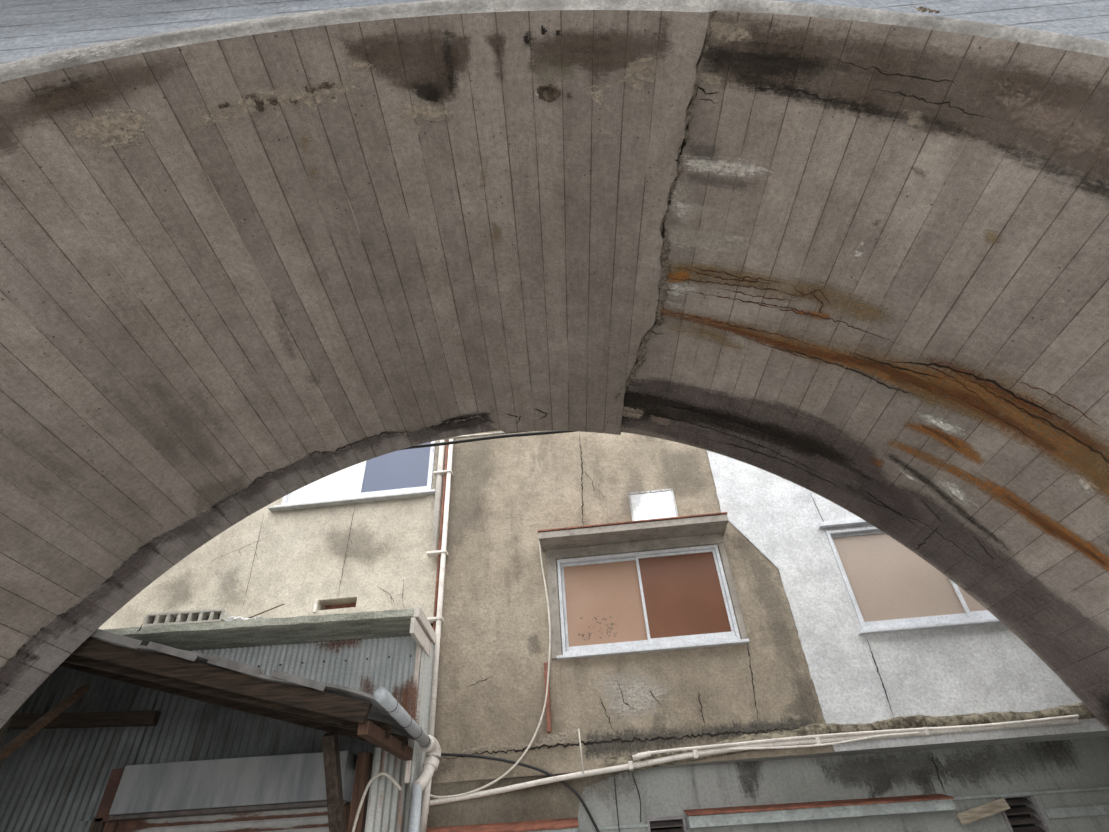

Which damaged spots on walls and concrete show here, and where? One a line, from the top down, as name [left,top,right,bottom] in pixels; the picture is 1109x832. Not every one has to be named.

peeling [186,79,356,126]
water stain [346,31,469,102]
water stain [530,28,665,77]
crack [693,37,718,98]
water stain [702,17,1109,197]
crack [661,124,689,239]
rust [668,260,900,345]
rust [661,311,1109,499]
rust [892,423,1109,571]
water stain [622,379,1109,726]
water stain [585,715,816,758]
water stain [822,740,1076,798]